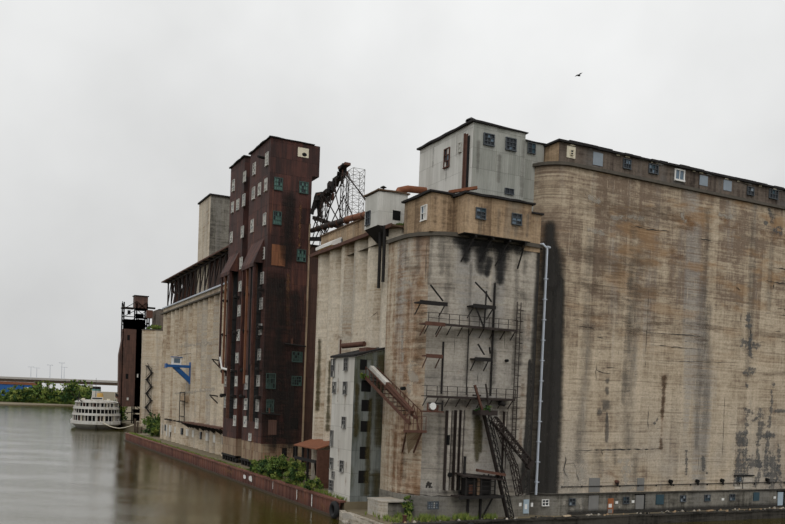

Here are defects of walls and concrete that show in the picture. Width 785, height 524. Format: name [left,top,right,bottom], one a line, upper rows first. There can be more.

damp [454,222,564,495]
crack [645,292,752,365]